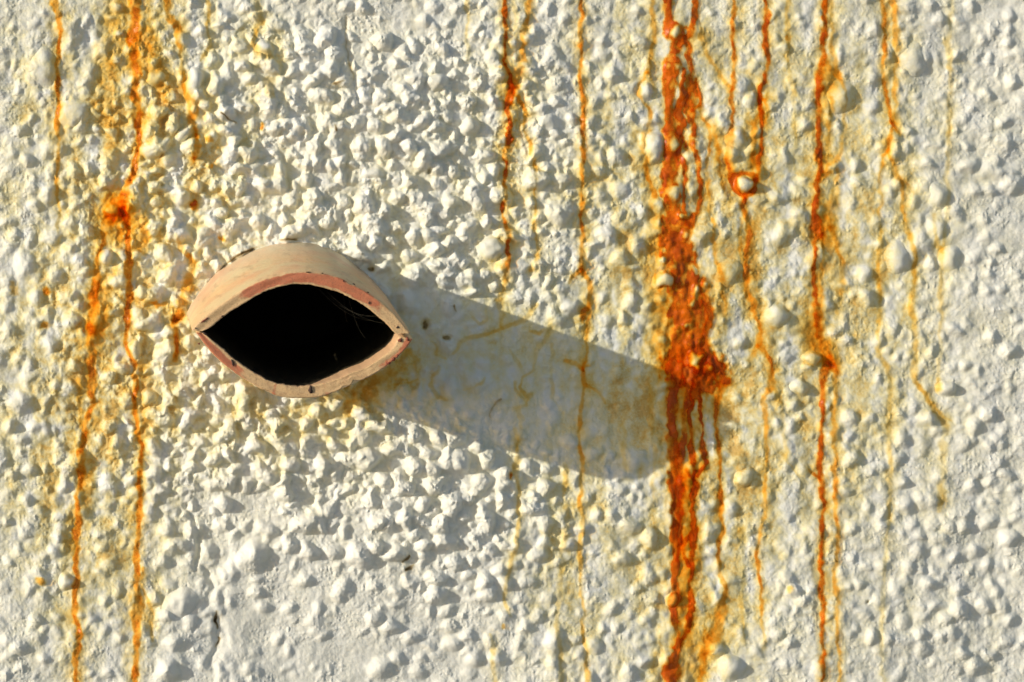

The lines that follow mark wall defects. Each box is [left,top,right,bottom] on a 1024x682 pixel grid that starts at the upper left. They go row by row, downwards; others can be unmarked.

rust [762,18,770,60]
rust [131,114,141,180]
rust [503,61,515,144]
rust [729,172,758,209]
rust [756,74,766,163]
rust [811,118,823,297]
rust [659,0,730,682]
rust [817,369,828,475]
rust [818,488,836,598]